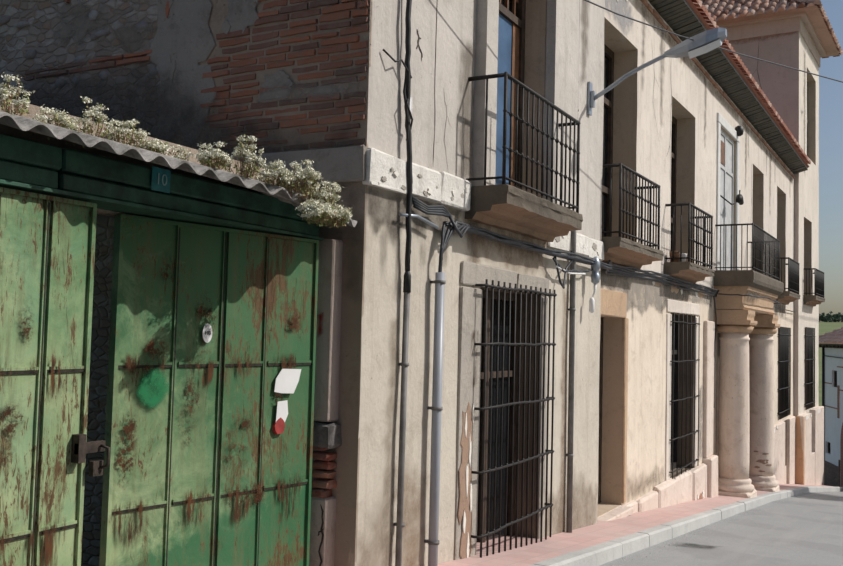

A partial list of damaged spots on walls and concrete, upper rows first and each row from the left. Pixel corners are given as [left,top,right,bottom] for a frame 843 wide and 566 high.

corrosion [50,358,67,393]
corrosion [126,340,165,376]
corrosion [277,354,296,369]
corrosion [0,406,23,463]
corrosion [116,415,137,481]
peeling [458,402,475,559]
corrosion [28,520,66,566]
corrosion [114,500,148,546]
crack [317,504,325,566]